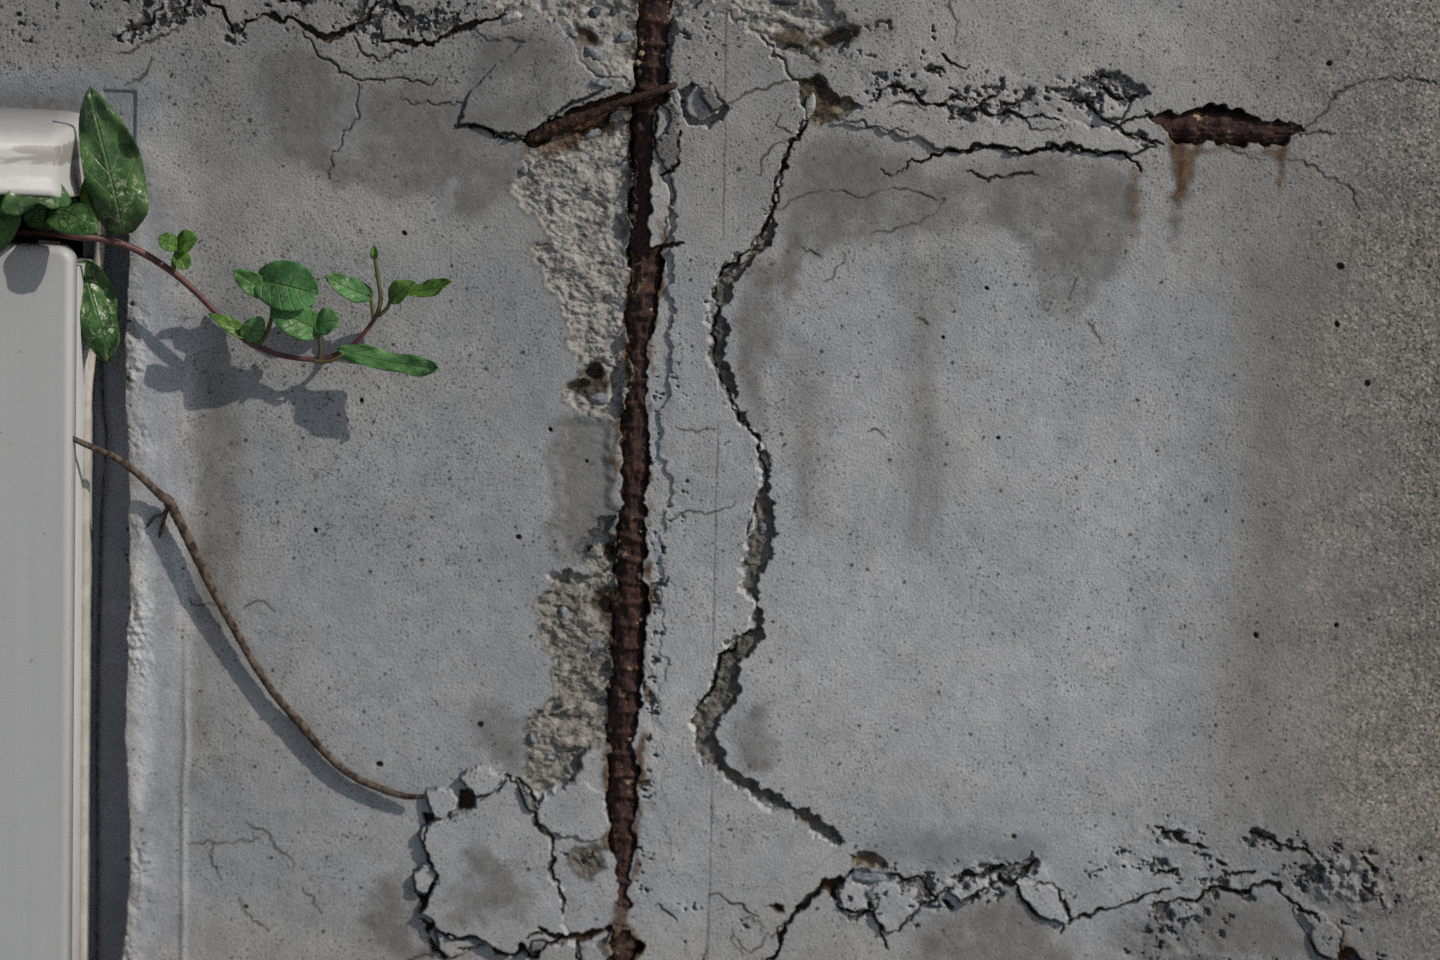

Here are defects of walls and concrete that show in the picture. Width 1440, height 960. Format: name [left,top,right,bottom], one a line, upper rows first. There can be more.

crack [119,0,528,179]
spalling [486,0,681,423]
corrosion [623,92,635,328]
spalling [666,0,894,127]
corrosion [1171,143,1203,201]
crack [1224,76,1437,211]
crack [666,0,1335,960]
corrosion [640,543,653,707]
crack [412,773,581,960]
corrosion [600,903,645,960]
crack [1359,856,1384,907]